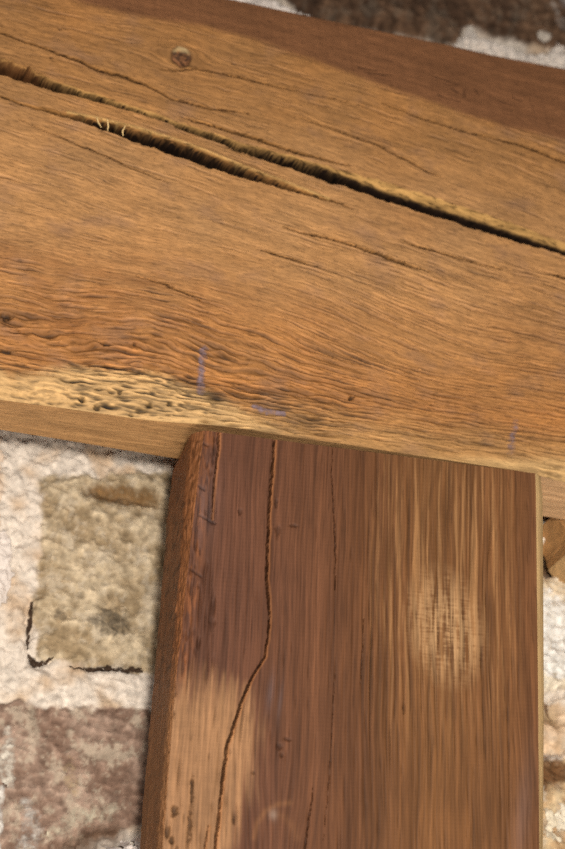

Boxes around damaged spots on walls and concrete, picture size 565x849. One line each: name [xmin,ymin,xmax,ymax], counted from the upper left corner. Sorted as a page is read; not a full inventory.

crack [0,31,565,279]
crack [204,434,276,849]